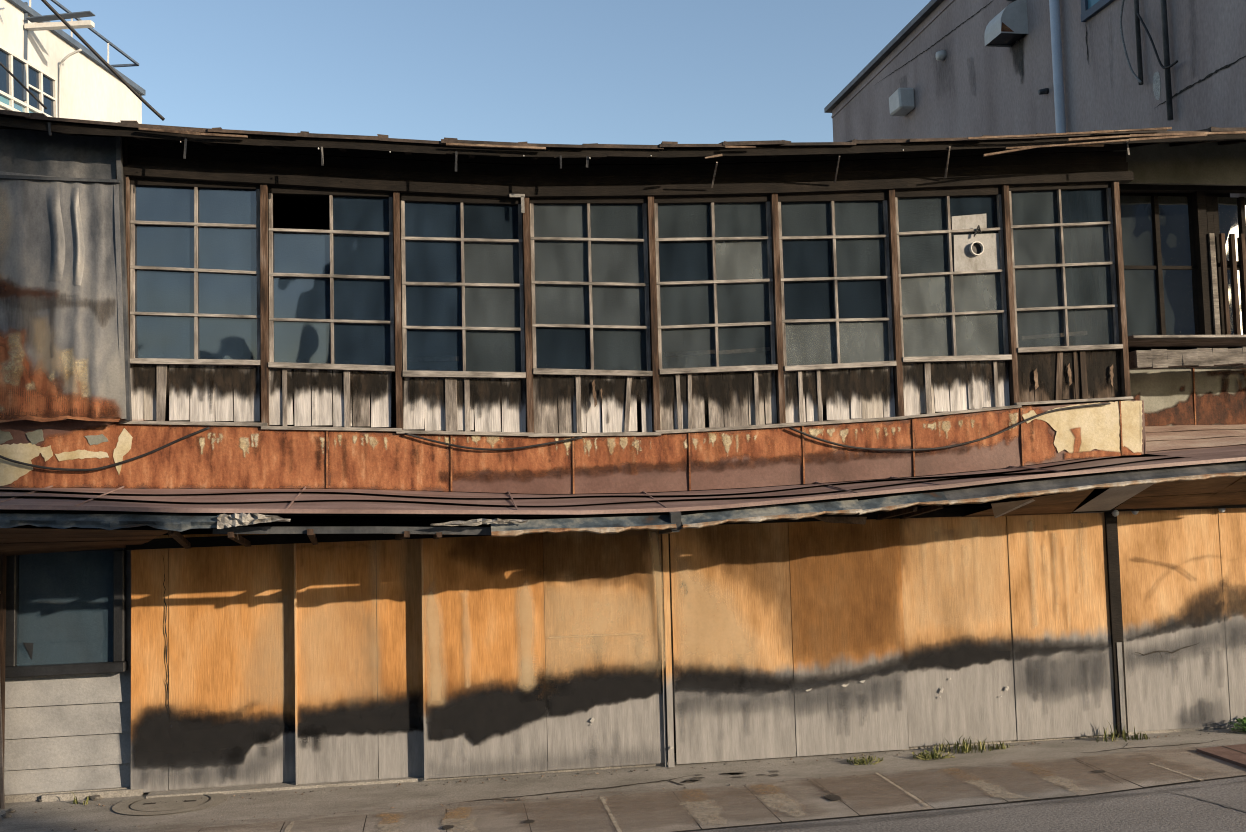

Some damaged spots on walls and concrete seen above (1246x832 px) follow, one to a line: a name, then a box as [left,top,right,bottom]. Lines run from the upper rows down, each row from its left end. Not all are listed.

corrosion [0,282,57,297]
peeling [0,428,133,486]
corrosion [0,333,1142,491]
damp [132,349,1121,421]
peeling [924,420,974,435]
peeling [1009,365,1143,453]
corrosion [1134,368,1246,426]
damp [453,532,663,646]
damp [1129,590,1246,662]
damp [133,588,1110,773]